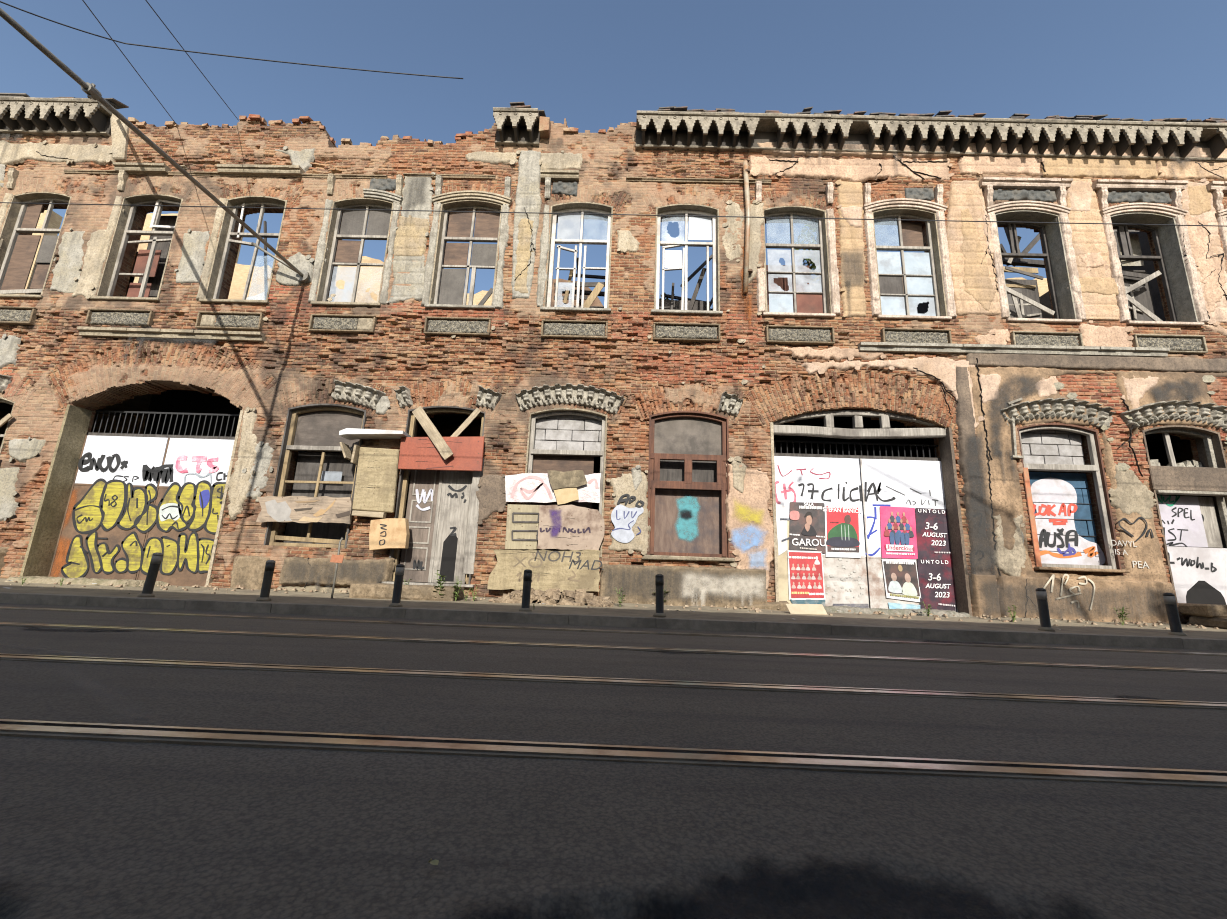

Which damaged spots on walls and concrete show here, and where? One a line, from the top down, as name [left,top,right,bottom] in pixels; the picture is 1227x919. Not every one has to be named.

peeling [0,140,116,187]
peeling [50,228,108,299]
peeling [174,229,210,284]
spalling [263,252,336,325]
peeling [379,172,509,338]
peeling [722,200,764,284]
peeling [748,155,1227,337]
crack [1183,221,1227,319]
spalling [611,307,766,386]
peeling [780,346,1001,428]
peeling [227,407,274,520]
spalling [1035,373,1160,519]